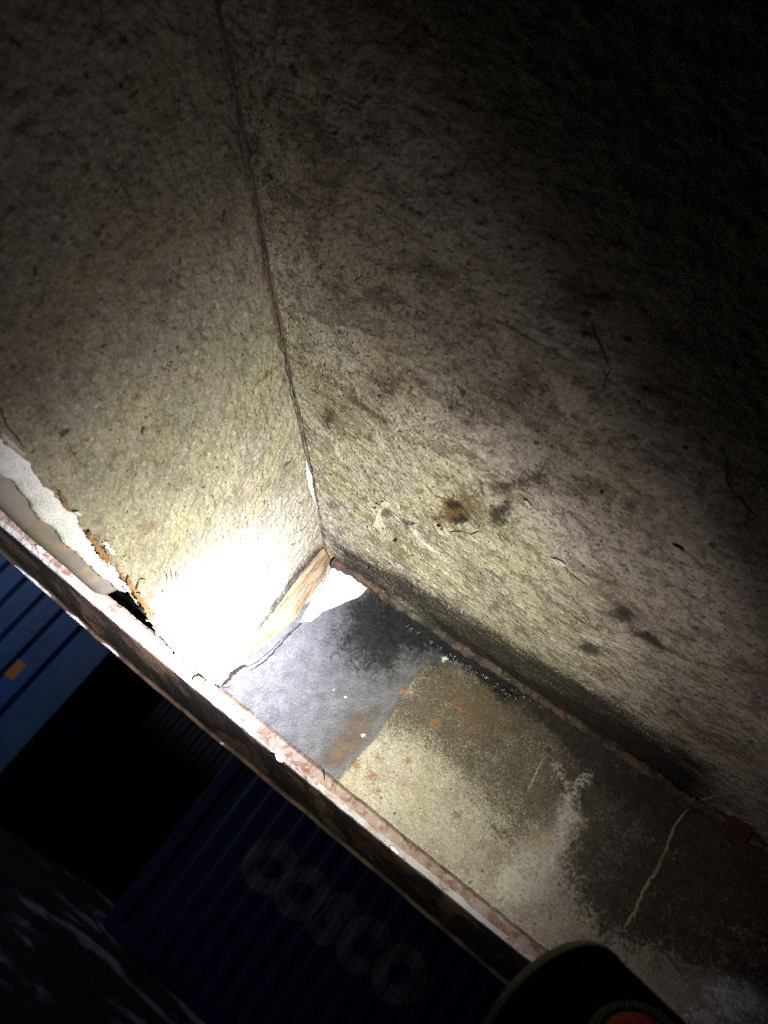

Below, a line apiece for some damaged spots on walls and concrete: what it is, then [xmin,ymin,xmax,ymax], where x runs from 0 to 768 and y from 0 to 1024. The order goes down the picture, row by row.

spalling [0,413,154,619]
water stain [220,588,693,856]
water stain [621,808,689,932]